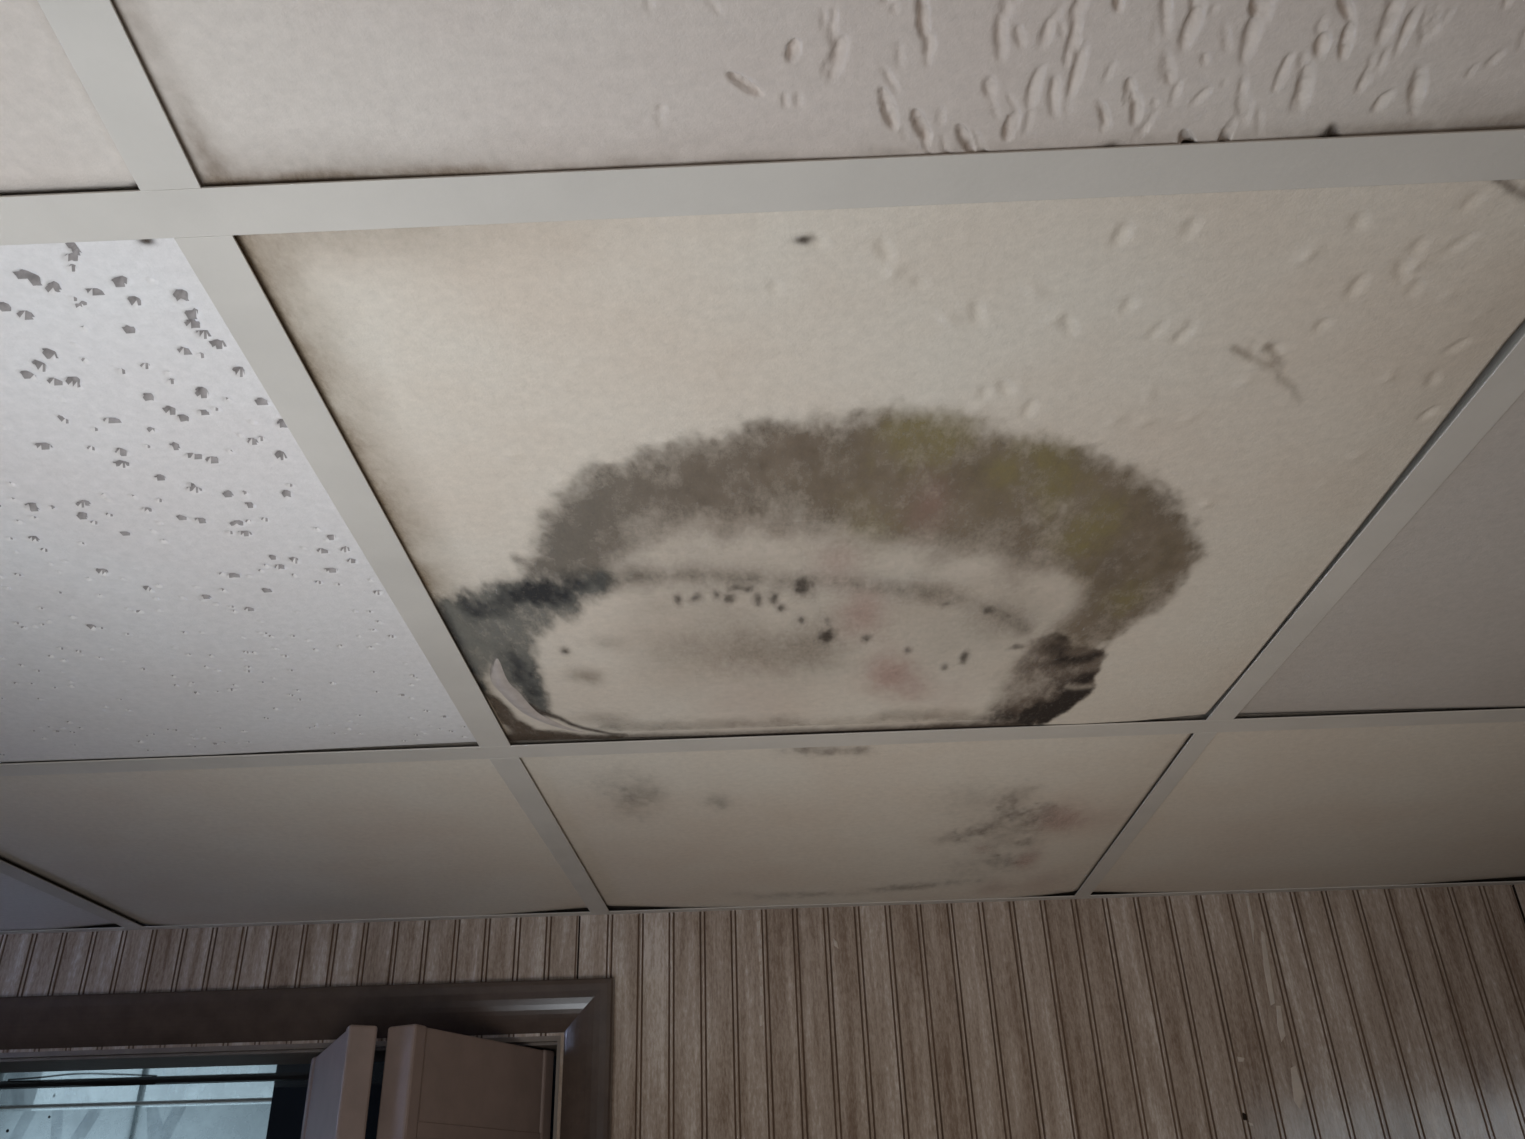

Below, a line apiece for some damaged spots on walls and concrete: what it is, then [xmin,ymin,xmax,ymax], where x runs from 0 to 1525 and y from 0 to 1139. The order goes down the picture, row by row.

leakage [233,235,324,396]
leakage [333,418,405,544]
leakage [414,414,1200,741]